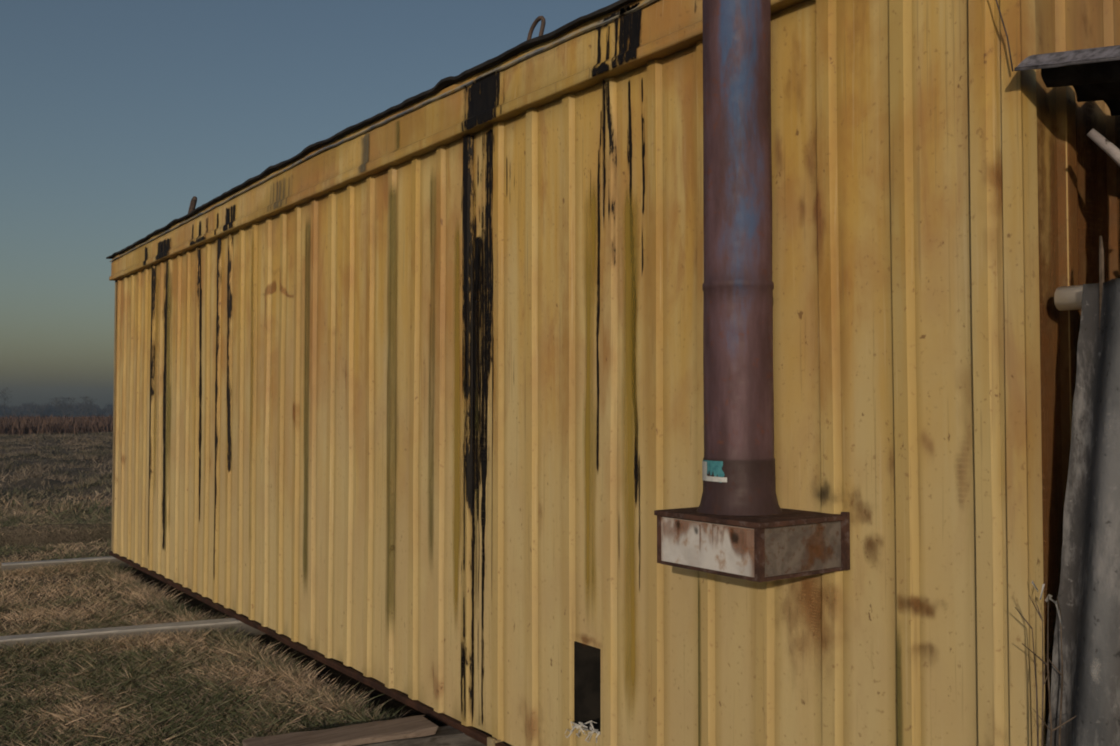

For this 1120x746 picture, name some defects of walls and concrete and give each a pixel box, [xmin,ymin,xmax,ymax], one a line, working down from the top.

water stain [148,261,171,550]
water stain [190,218,233,544]
water stain [461,129,507,724]
water stain [589,3,645,590]
rust [661,517,754,564]